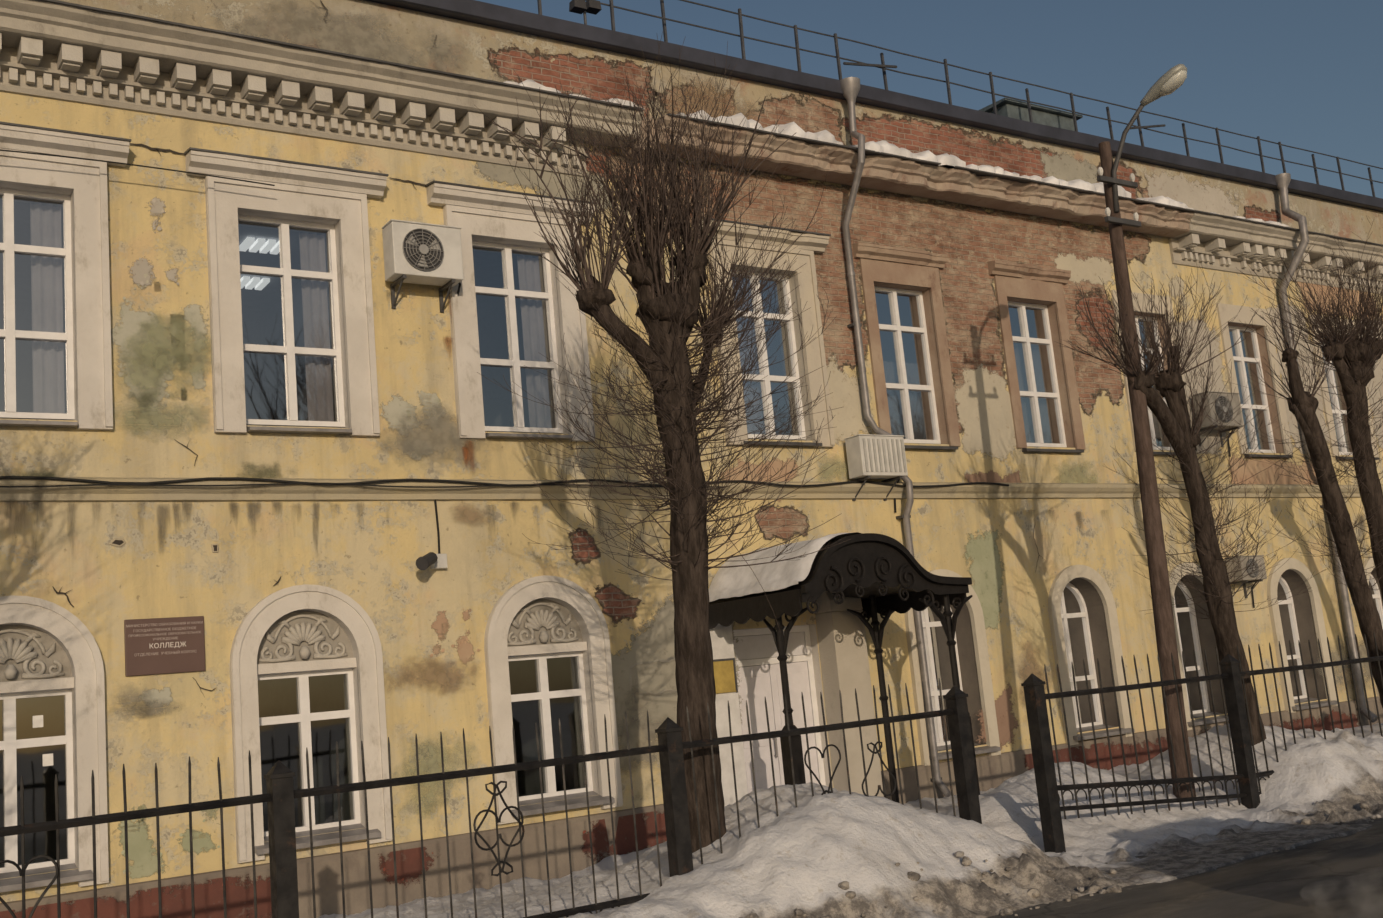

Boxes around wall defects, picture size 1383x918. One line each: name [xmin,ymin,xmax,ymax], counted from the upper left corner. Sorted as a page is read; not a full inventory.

flaking render [487,43,1281,222]
flaking render [475,146,1152,499]
water stain [130,323,210,400]
water stain [385,406,477,460]
flaking render [568,527,601,565]
flaking render [755,499,810,542]
flaking render [594,582,644,627]
peeling [430,609,480,664]
peeling [379,847,438,886]